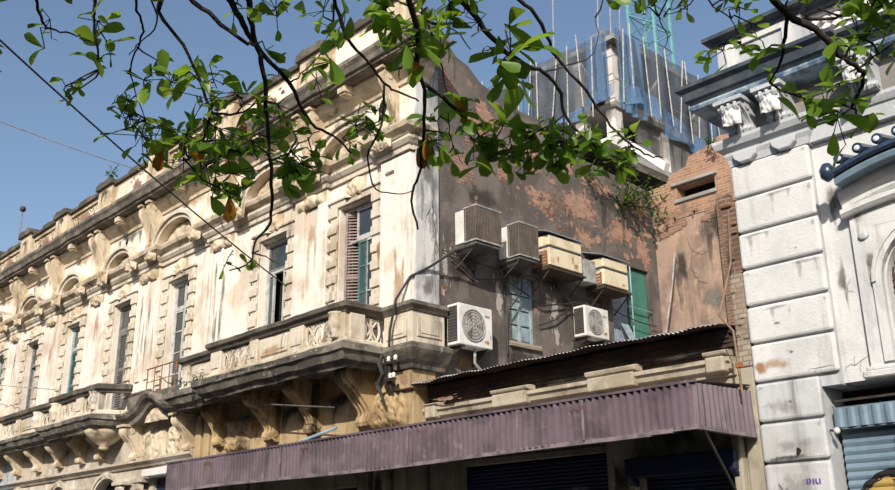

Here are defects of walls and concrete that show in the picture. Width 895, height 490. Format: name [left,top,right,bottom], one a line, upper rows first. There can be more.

flaking render [446,98,512,205]
flaking render [489,150,734,271]
peeling [493,271,505,318]
peeling [550,287,562,346]
rust [756,361,781,373]